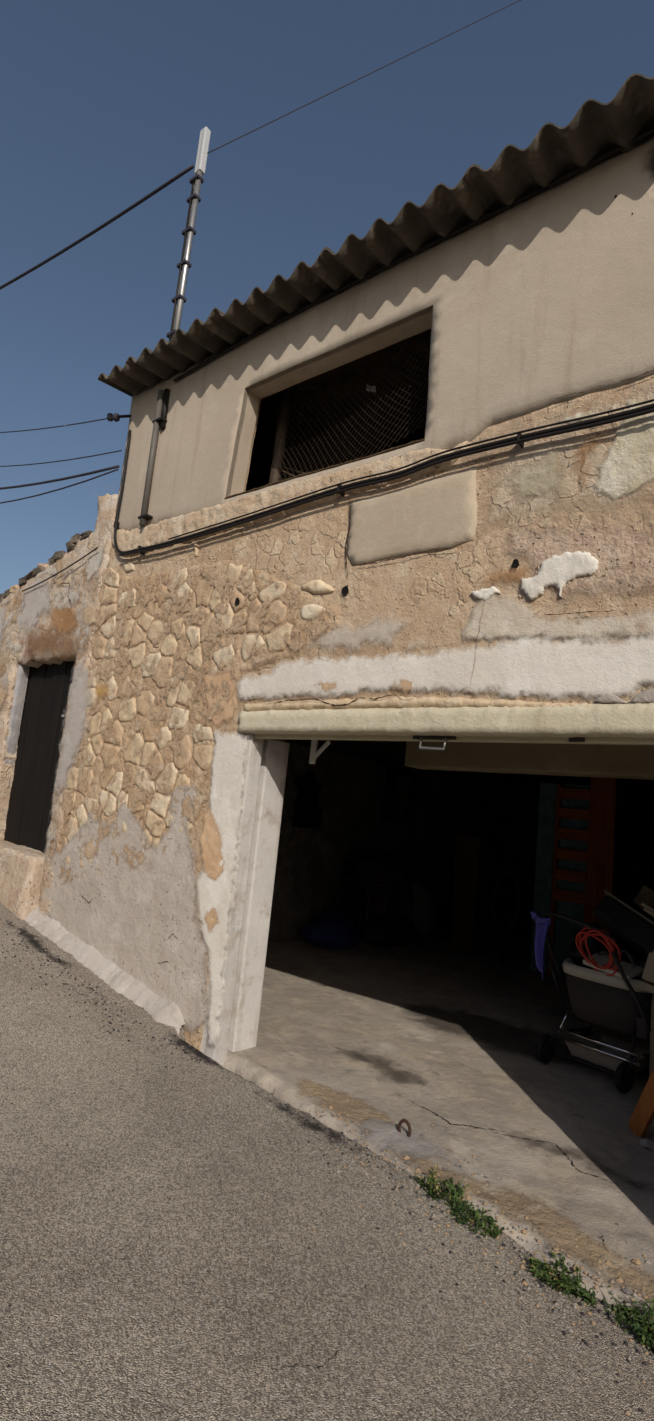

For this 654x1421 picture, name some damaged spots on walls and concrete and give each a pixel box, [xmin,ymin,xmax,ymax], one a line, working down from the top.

spalling [552,412,594,427]
spalling [579,398,654,499]
spalling [509,451,563,498]
peeling [471,586,501,601]
peeling [511,551,599,601]
spalling [47,541,349,882]
flaking render [592,688,654,704]
spalling [205,908,218,931]